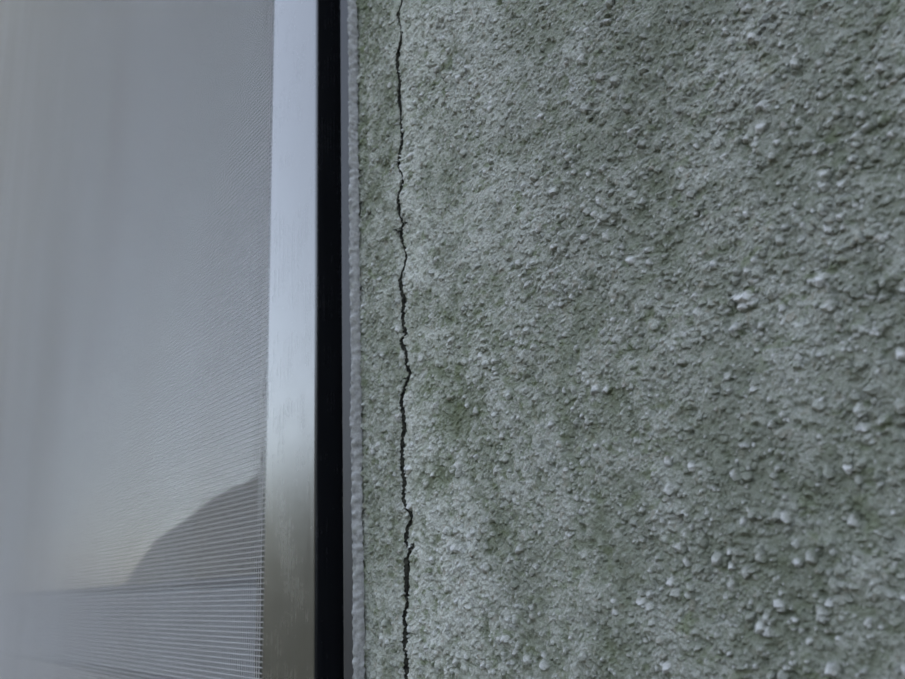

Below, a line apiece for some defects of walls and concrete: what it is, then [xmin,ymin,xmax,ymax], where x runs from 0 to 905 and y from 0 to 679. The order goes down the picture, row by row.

crack [393,0,414,679]